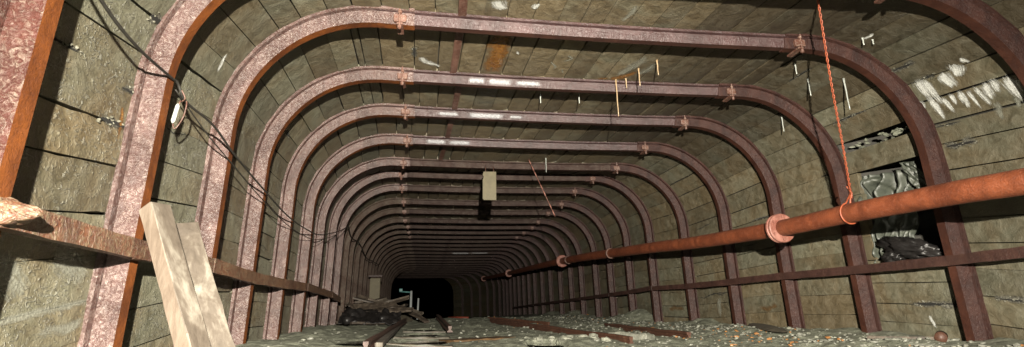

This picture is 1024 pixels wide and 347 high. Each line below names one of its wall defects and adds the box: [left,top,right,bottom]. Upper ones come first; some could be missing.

corrosion [485,35,512,71]
damp [915,58,1024,118]